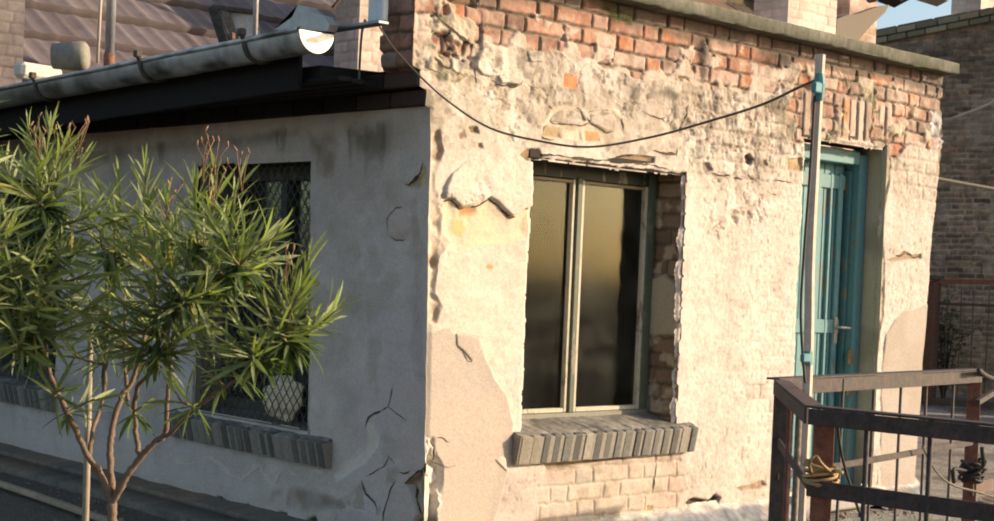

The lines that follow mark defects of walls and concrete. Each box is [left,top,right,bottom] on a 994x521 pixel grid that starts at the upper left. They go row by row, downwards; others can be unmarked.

flaking render [379,0,943,353]
peeling [456,333,482,361]
crack [365,390,404,426]
crack [361,437,453,519]
spalling [534,453,721,521]